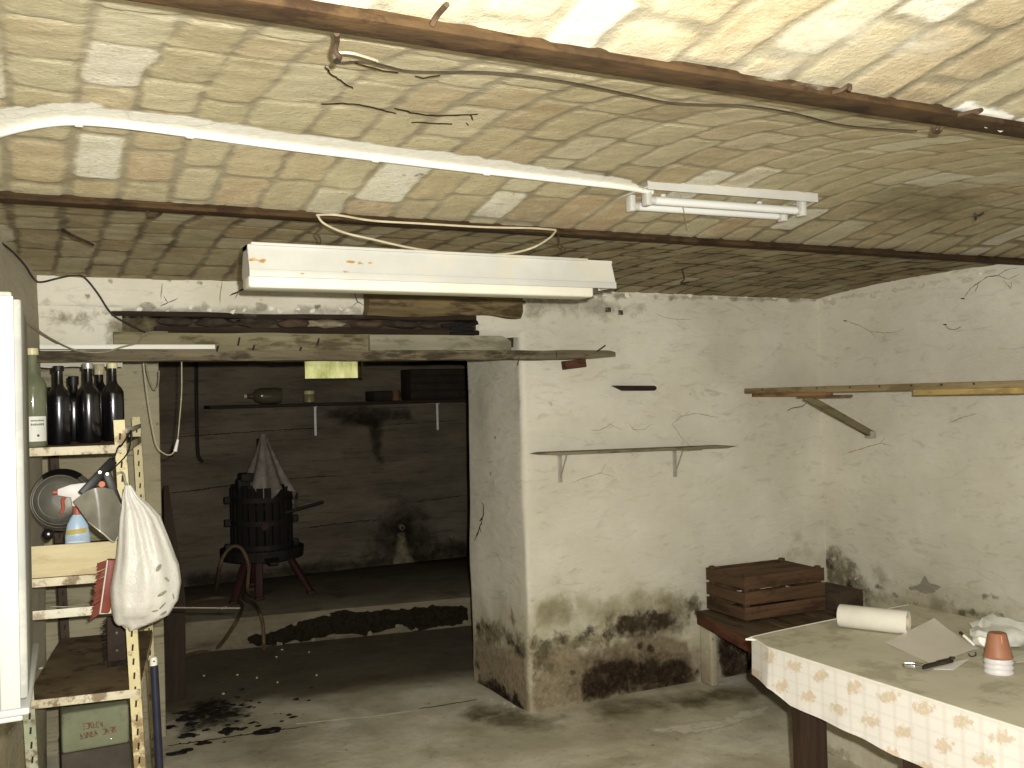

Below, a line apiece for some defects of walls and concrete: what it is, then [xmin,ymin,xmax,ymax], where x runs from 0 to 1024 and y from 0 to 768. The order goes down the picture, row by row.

crack [322,60,478,126]
crack [965,268,1019,296]
damp [826,550,879,600]
damp [477,611,698,714]
damp [467,677,525,725]